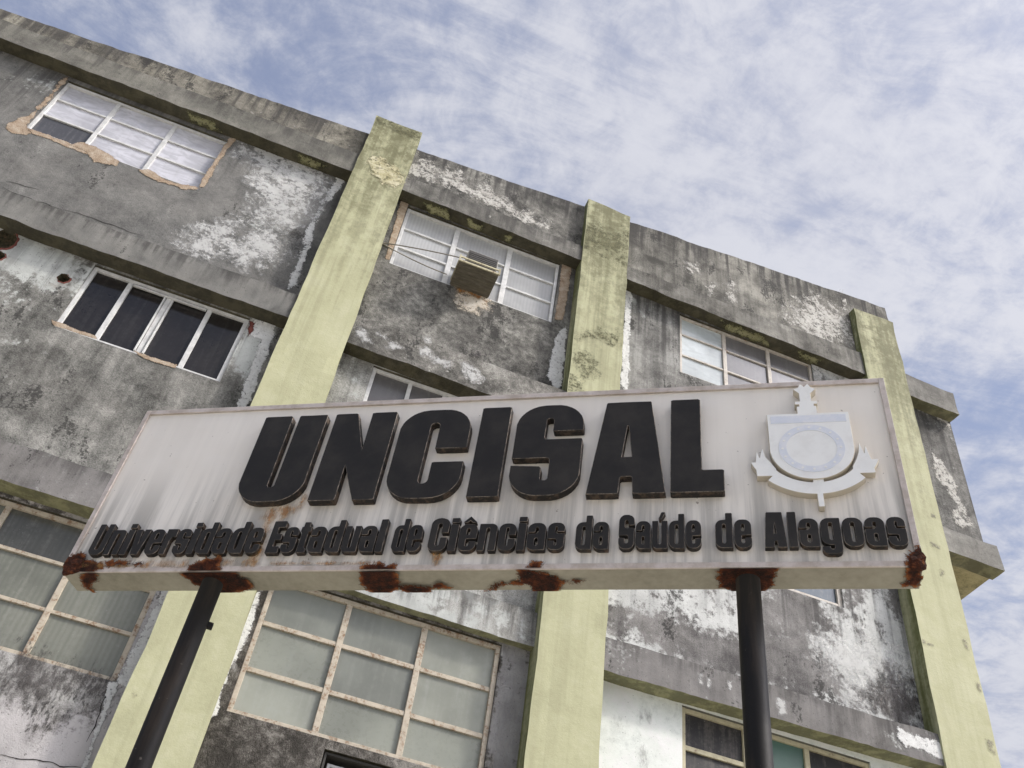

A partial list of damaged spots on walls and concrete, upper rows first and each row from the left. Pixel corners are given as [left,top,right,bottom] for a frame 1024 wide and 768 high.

spalling [6,76,120,166]
spalling [139,138,236,190]
water stain [192,143,330,267]
peeling [366,156,552,231]
spalling [52,320,97,339]
spalling [134,350,177,368]
water stain [852,610,892,646]
water stain [854,659,923,723]